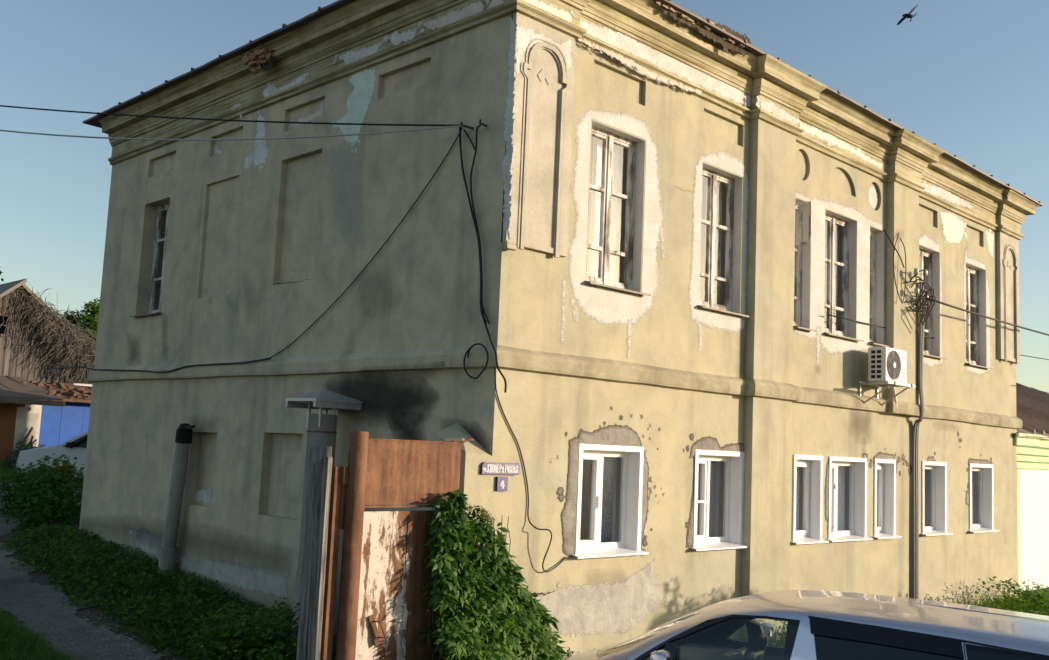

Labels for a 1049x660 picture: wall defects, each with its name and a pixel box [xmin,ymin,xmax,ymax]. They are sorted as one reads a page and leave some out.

peeling [241,73,309,174]
peeling [288,0,505,153]
peeling [500,0,883,240]
peeling [921,180,974,244]
damp [395,421,419,440]
flaking render [534,415,666,637]
flaking render [685,433,744,548]